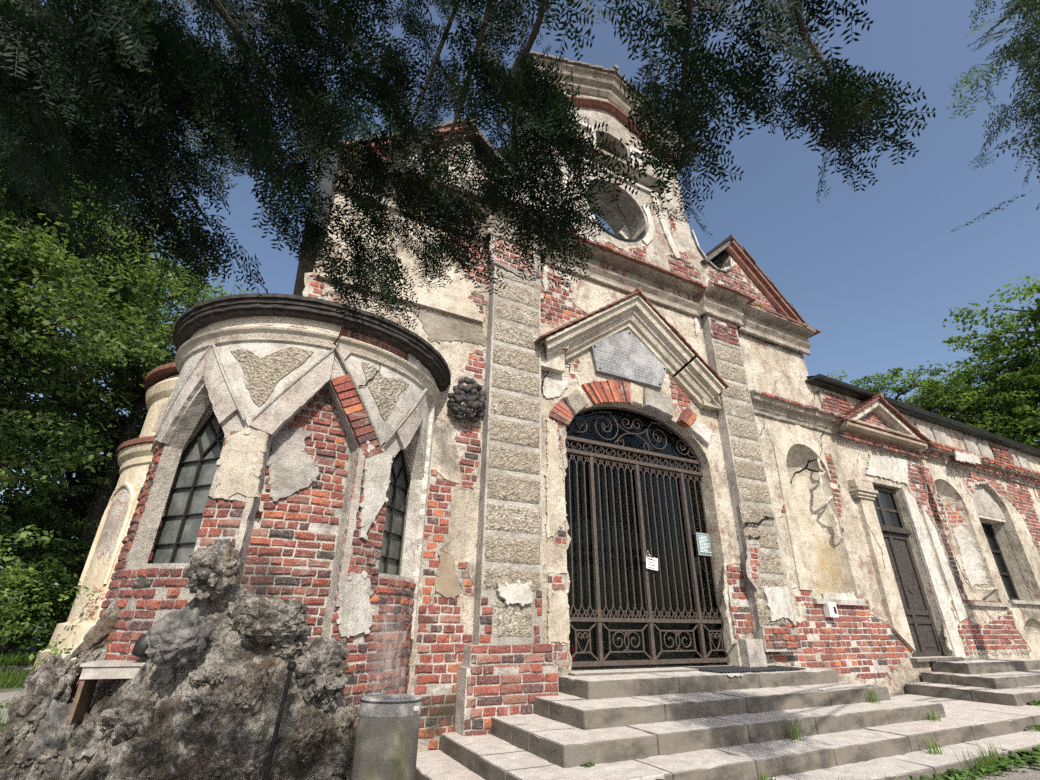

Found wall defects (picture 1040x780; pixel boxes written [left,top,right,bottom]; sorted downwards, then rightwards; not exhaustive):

spalling [302,272,330,300]
flaking render [363,235,588,383]
flaking render [215,426,319,502]
crack [790,432,824,484]
flaking render [335,571,375,638]
spalling [412,420,483,749]
flaking render [496,567,572,672]
crack [744,516,775,539]
spalling [723,540,914,686]
spalling [865,450,1040,660]